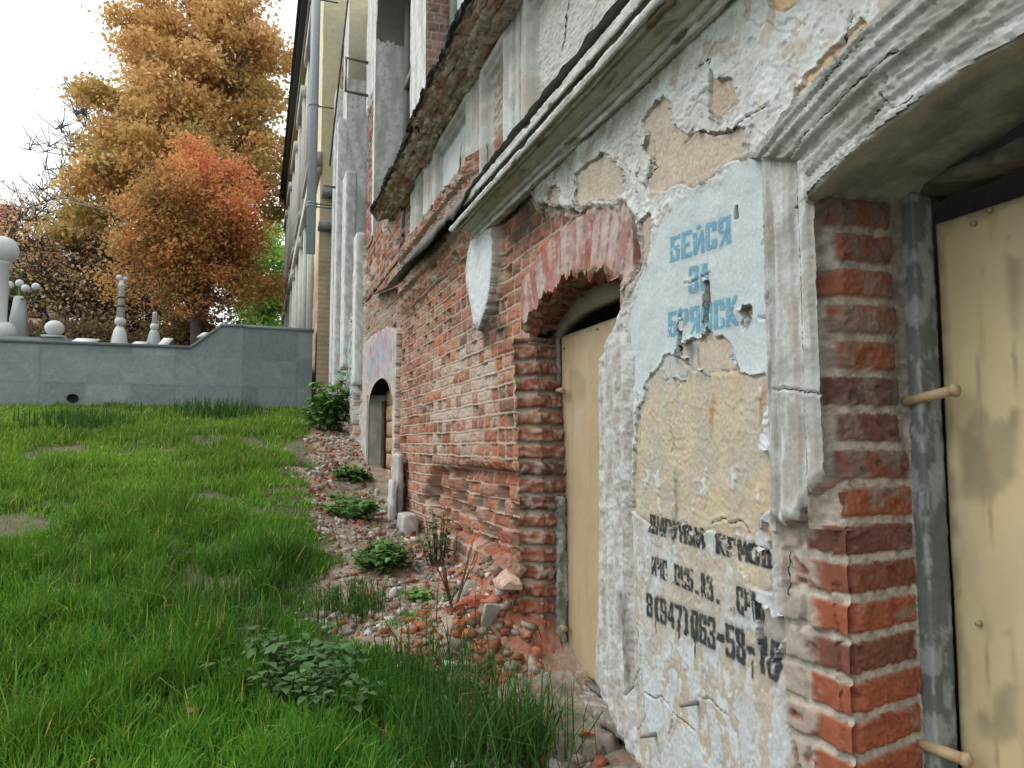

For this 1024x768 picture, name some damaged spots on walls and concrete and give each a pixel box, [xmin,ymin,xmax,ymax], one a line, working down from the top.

peeling [641,69,754,192]
crack [791,15,913,157]
flaking render [397,144,625,563]
peeling [631,277,856,768]